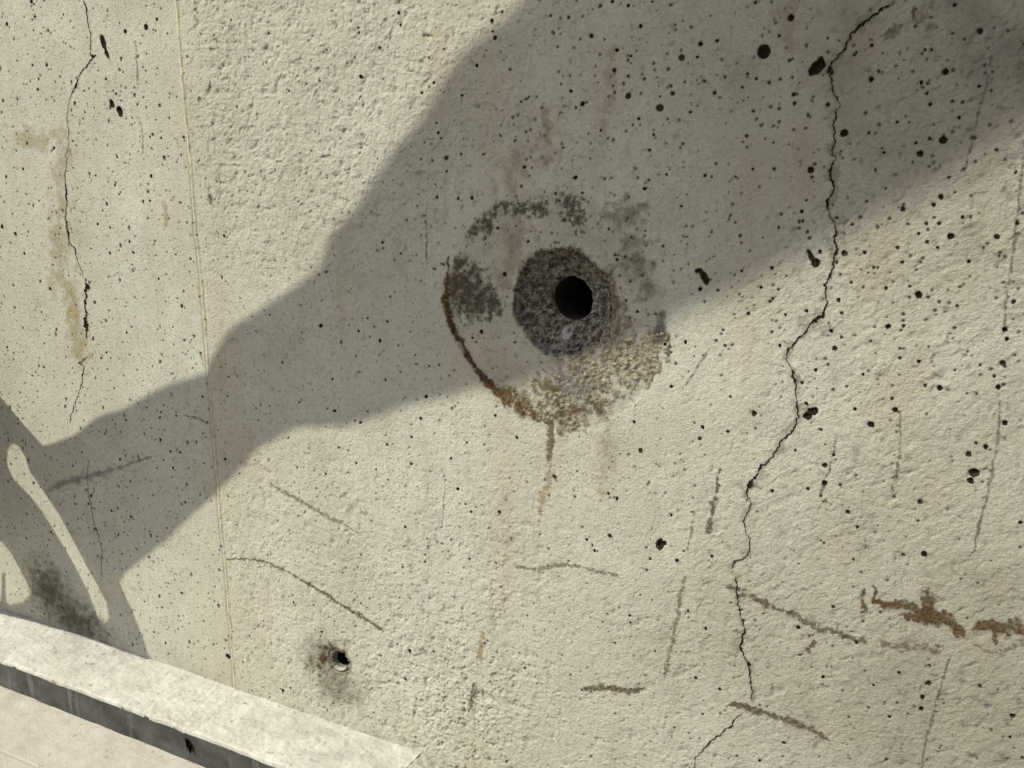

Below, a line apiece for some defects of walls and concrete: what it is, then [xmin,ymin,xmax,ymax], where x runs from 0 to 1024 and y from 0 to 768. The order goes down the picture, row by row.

crack [64,1,96,421]
rust [537,419,557,515]
crack [694,1,894,767]